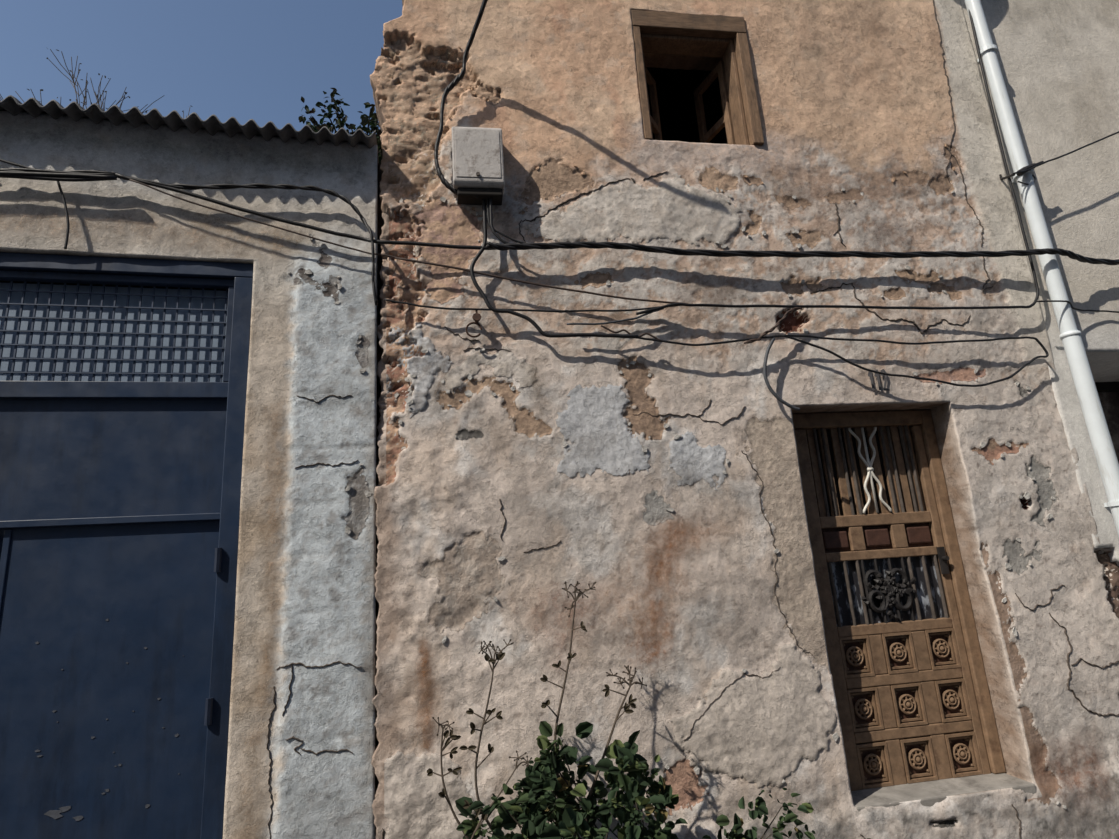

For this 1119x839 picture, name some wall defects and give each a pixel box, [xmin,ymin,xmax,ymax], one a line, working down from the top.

crack [933,0,993,291]
crack [519,171,667,242]
peeling [288,234,342,304]
crack [810,283,971,334]
peeling [378,33,830,674]
crack [633,399,746,425]
peeling [341,464,372,540]
peeling [971,438,1059,526]
flaking render [1094,550,1119,618]
flaking render [981,538,1066,809]
crack [1015,584,1119,717]
crack [266,661,361,839]